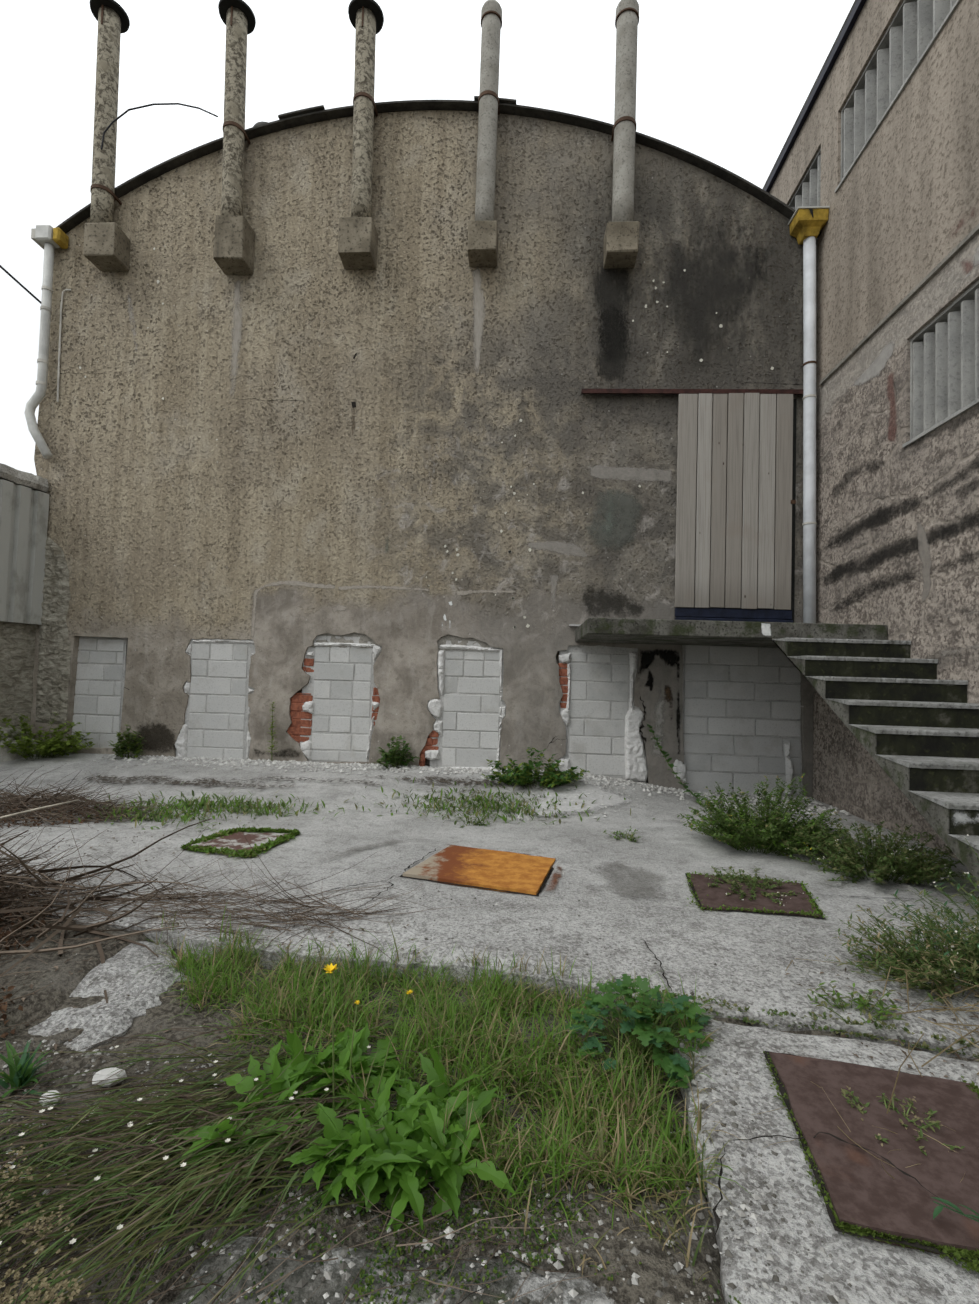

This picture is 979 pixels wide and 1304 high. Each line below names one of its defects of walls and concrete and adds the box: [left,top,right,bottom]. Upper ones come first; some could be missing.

water stain [594,267,633,380]
water stain [913,459,979,506]
water stain [826,509,891,550]
water stain [824,518,979,584]
flaking render [303,632,378,672]
flaking render [437,635,490,650]
flaking render [287,693,313,743]
flaking render [371,687,380,725]
flaking render [419,730,439,766]